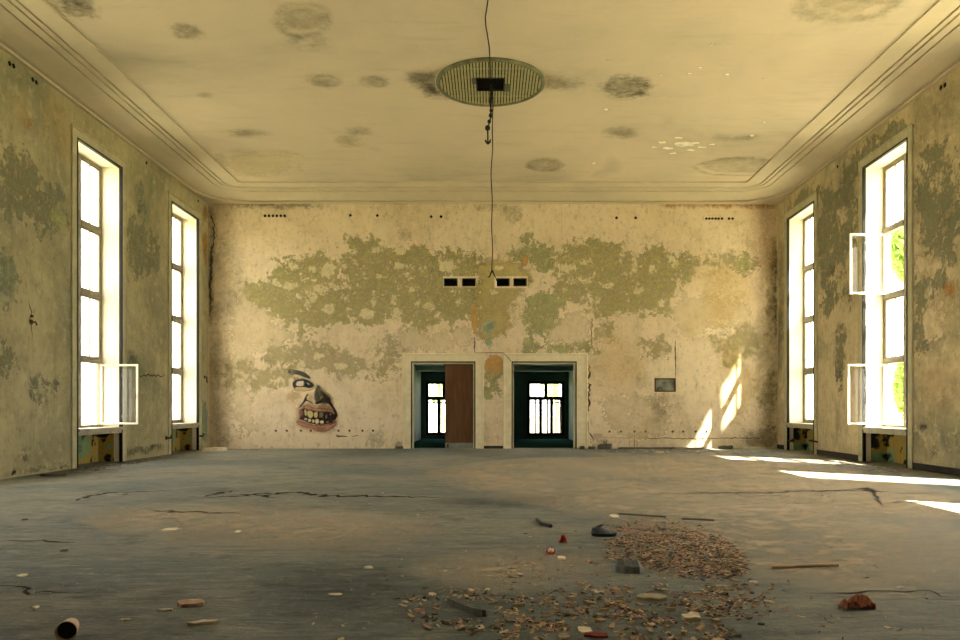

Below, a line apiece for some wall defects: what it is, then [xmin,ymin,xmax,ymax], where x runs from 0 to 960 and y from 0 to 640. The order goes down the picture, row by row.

peeling [0,140,67,241]
peeling [652,137,715,154]
peeling [784,117,906,396]
peeling [914,139,960,357]
peeling [215,232,760,390]
crack [76,490,438,514]
crack [645,486,943,507]